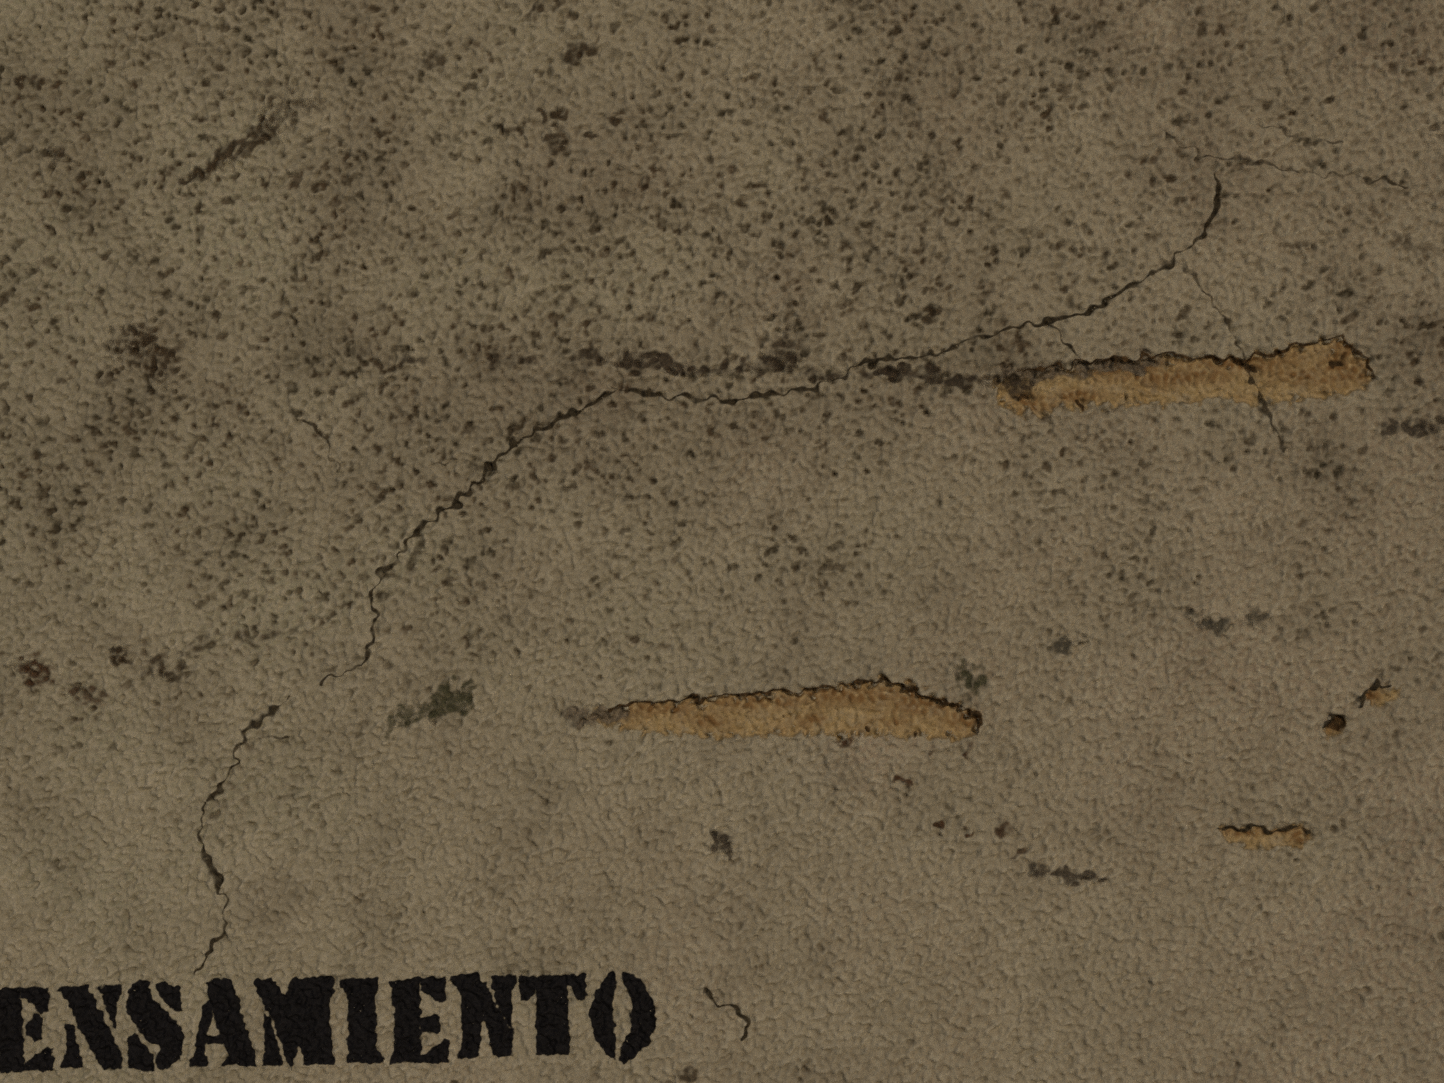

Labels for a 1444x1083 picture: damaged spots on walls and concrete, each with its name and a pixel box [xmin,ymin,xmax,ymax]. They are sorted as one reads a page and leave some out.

crack [1364,178,1408,189]
spalling [993,334,1375,418]
crack [194,126,1287,974]
spalling [561,674,983,743]
spalling [1217,823,1311,851]